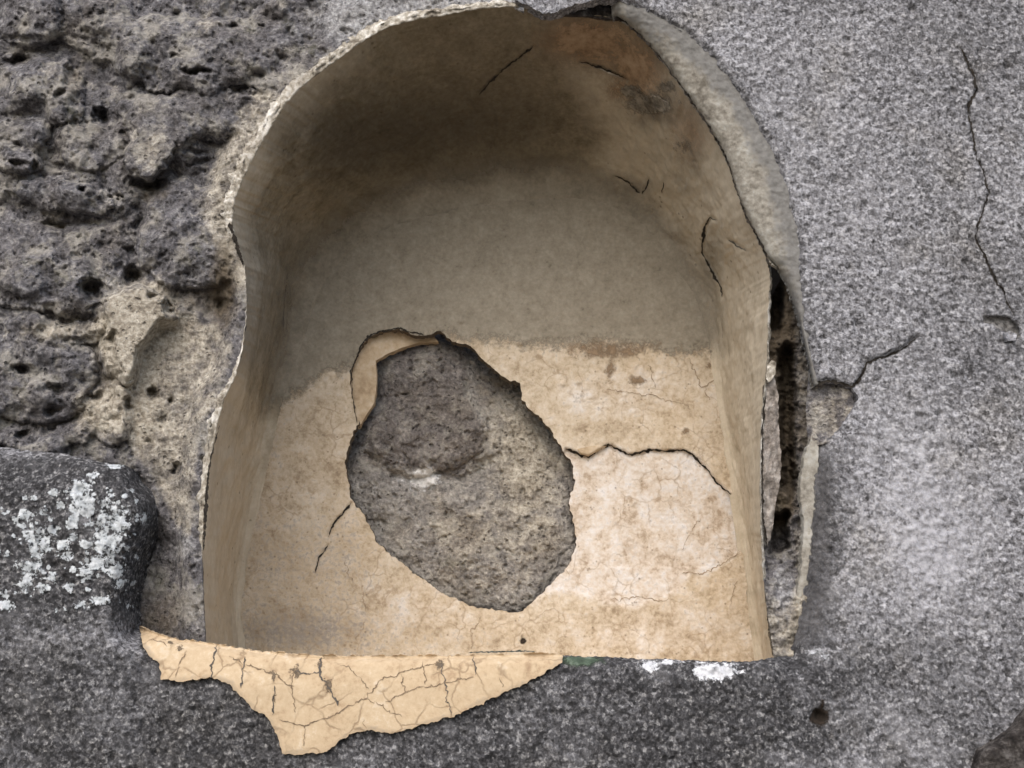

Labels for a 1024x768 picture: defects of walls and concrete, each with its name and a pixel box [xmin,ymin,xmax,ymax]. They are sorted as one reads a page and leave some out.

spalling [220,0,520,250]
crack [479,48,532,95]
crack [616,17,770,296]
crack [960,48,1014,315]
spalling [196,284,247,563]
spalling [350,327,439,430]
spalling [401,467,440,491]
crack [566,444,730,494]
spalling [806,380,856,446]
crack [818,338,916,388]
crack [315,503,366,639]
peeling [139,626,563,755]